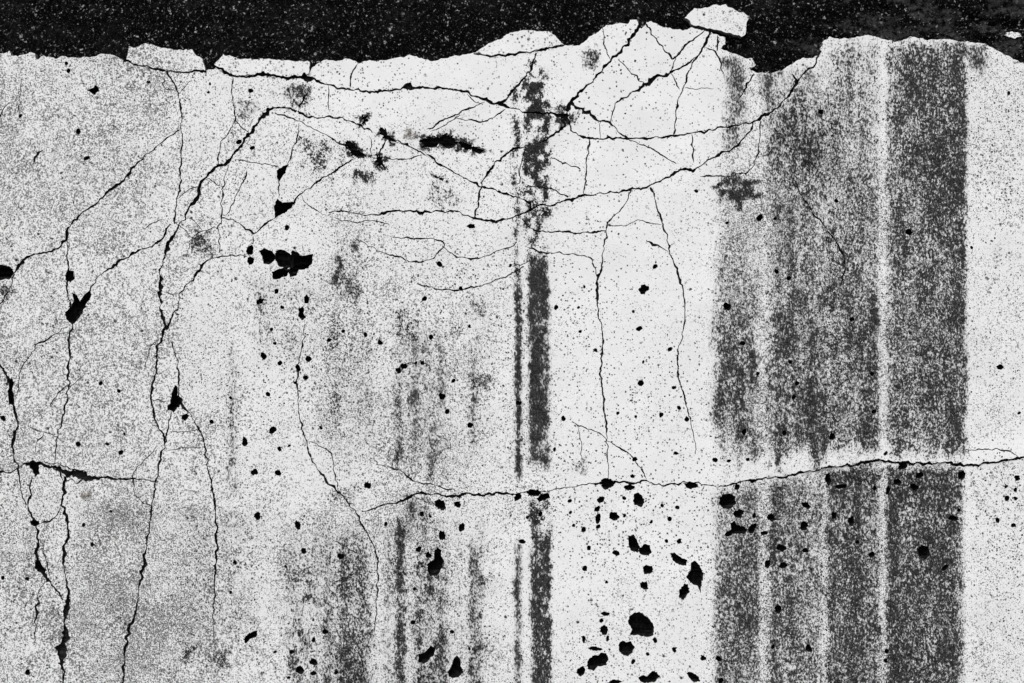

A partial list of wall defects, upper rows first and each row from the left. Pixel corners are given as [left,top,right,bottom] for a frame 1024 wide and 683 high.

crack [0,24,822,683]
damp [510,60,555,481]
damp [511,499,555,683]
damp [709,38,988,683]
crack [755,447,1024,481]